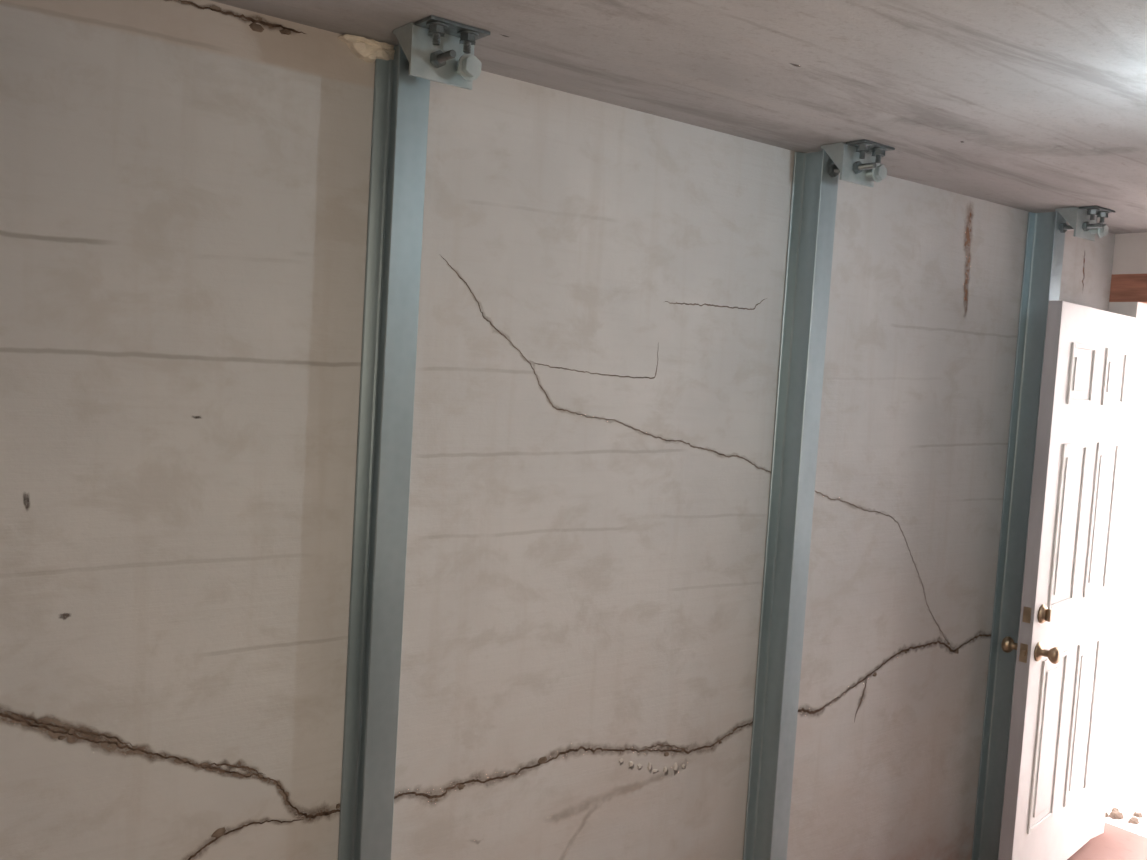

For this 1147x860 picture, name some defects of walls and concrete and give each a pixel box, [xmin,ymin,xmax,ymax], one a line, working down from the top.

crack [166,0,305,35]
rust [964,212,972,312]
crack [441,256,771,473]
crack [798,491,991,722]
crack [0,708,340,860]
crack [394,721,753,803]